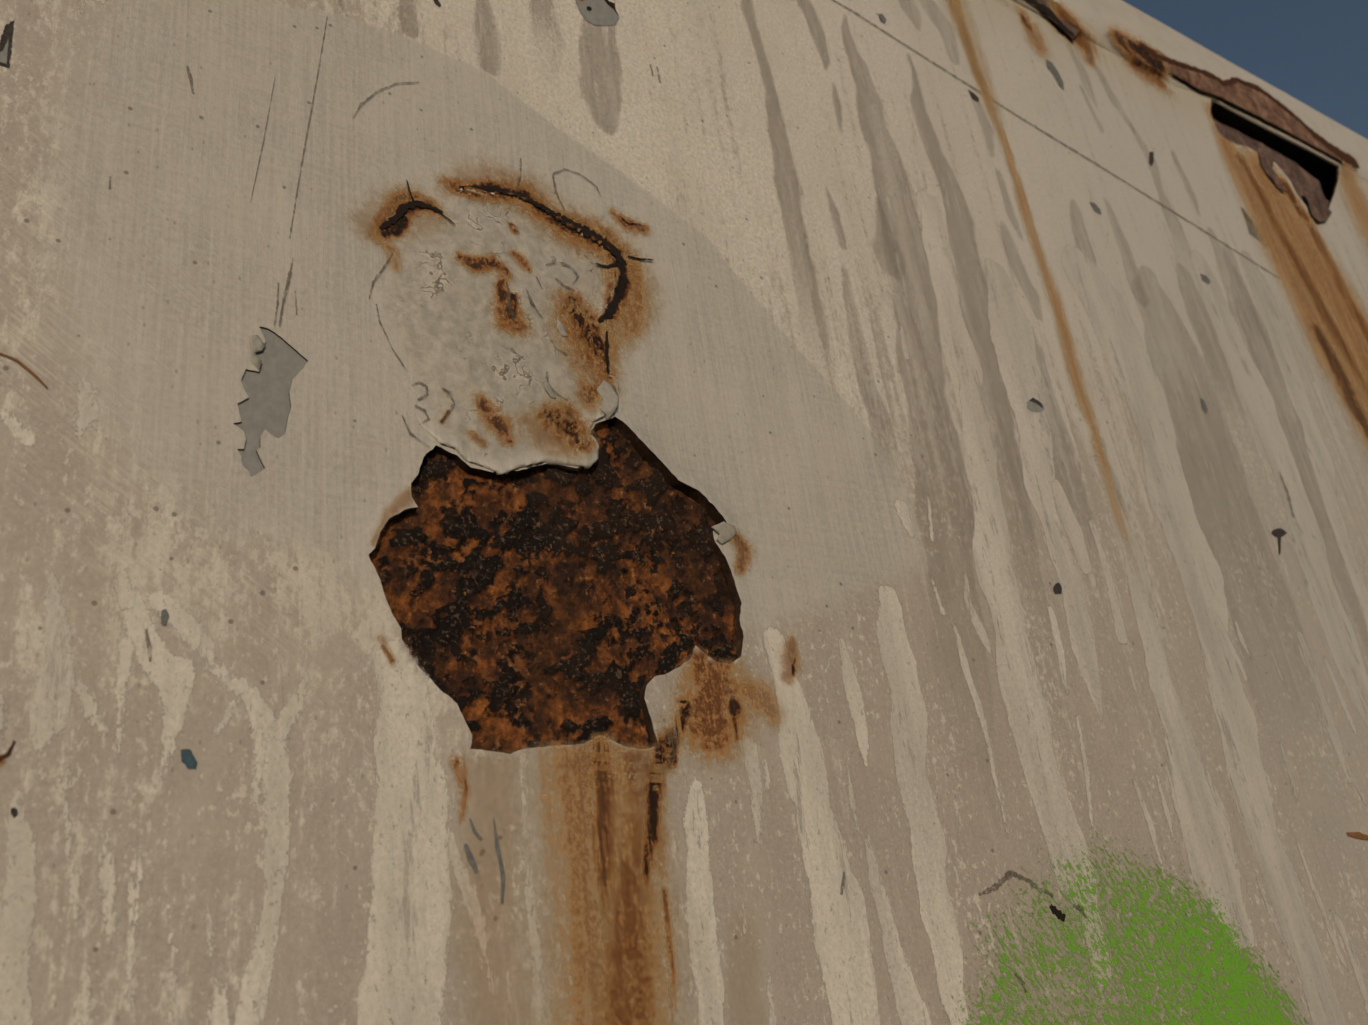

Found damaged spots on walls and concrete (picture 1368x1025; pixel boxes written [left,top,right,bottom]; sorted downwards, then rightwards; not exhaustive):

peeling [0,21,14,68]
peeling [576,0,620,26]
peeling [1046,59,1064,90]
rust [1016,0,1172,93]
peeling [233,326,308,477]
rust [948,0,1123,529]
rust [1207,104,1368,449]
leakage [916,190,1368,1025]
leakage [355,636,549,1025]
rust [539,637,800,1025]
leakage [683,777,725,1025]
leakage [743,585,970,1025]